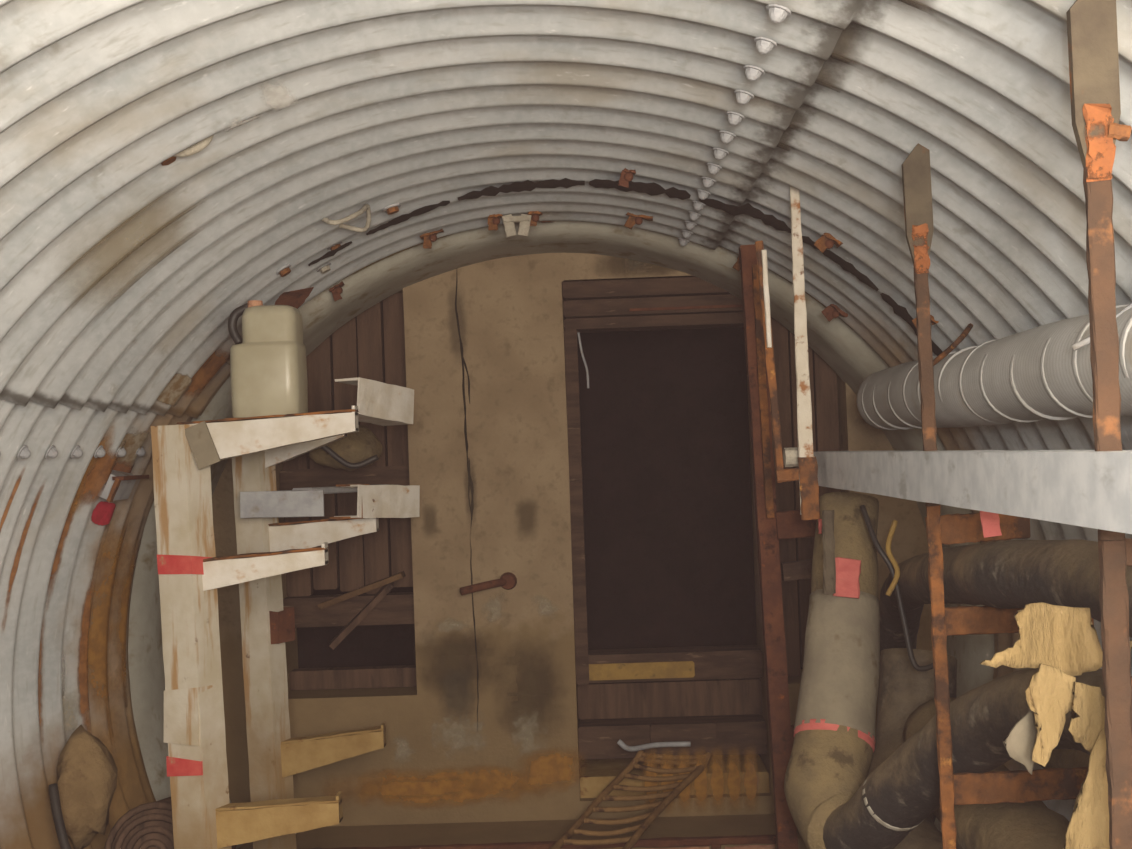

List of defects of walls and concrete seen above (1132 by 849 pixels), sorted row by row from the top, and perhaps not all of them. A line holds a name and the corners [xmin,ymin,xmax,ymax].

rust [912,223,930,274]
rust [0,475,22,532]
rust [6,491,41,603]
rust [48,436,109,587]
rust [106,475,149,502]
crack [455,277,479,732]
rust [78,534,135,726]